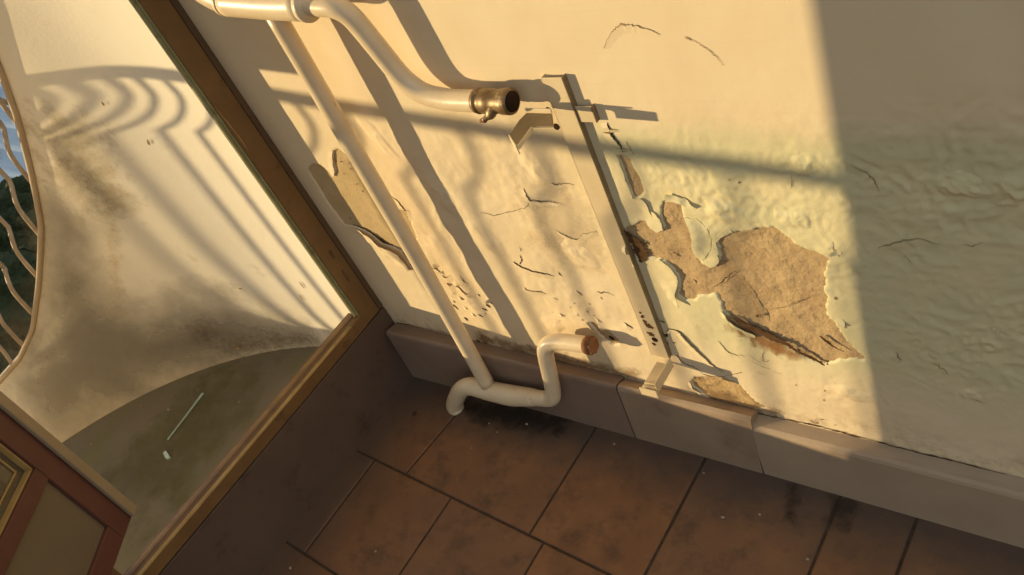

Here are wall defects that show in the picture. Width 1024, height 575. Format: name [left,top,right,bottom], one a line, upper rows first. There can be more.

crack [604,23,660,49]
flaking render [309,149,411,271]
crack [485,183,575,216]
peeling [426,247,492,321]
crack [513,250,612,300]
peeling [615,154,865,366]
crack [665,329,781,377]
spalling [688,376,765,408]
water stain [464,403,563,433]